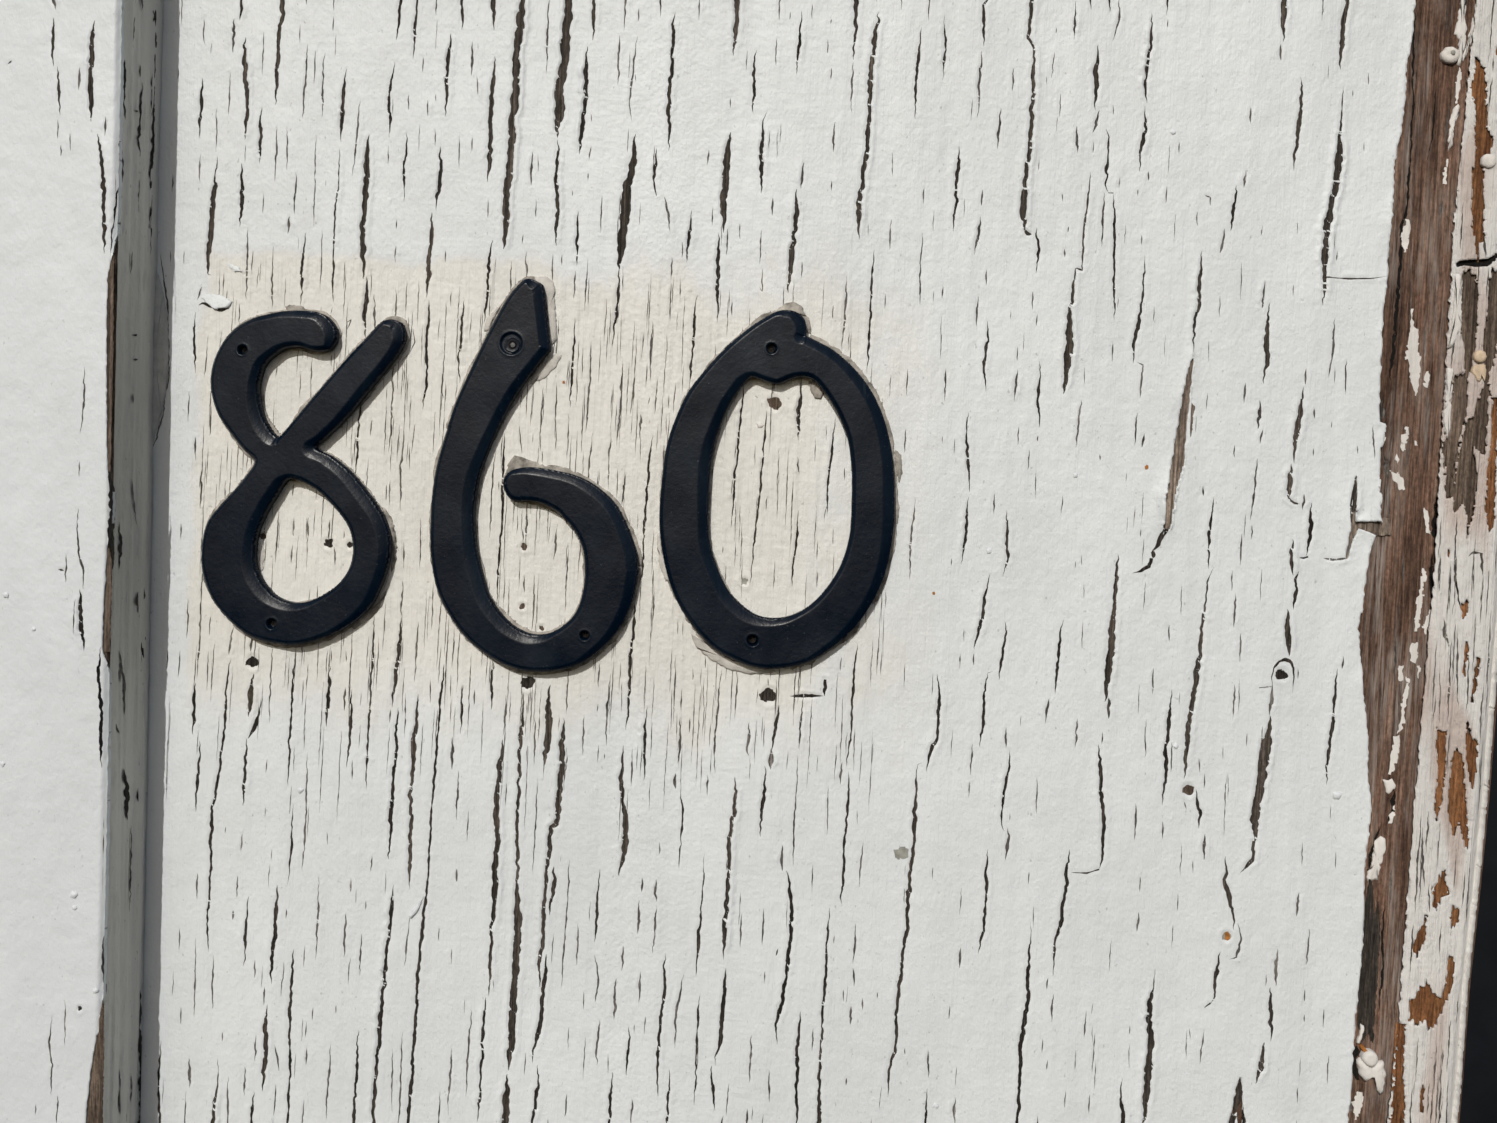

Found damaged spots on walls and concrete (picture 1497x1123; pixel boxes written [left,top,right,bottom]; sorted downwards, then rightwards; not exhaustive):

crack [1487,0,1495,104]
peeling [1405,0,1497,532]
crack [1440,201,1489,298]
crack [51,0,1178,1123]
crack [919,0,1455,1062]
crack [1229,789,1471,1123]
peeling [1346,509,1392,559]
peeling [1367,568,1431,881]
peeling [1388,956,1455,1123]
peeling [1412,870,1459,954]
crack [1402,496,1497,810]
peeling [1434,727,1478,847]